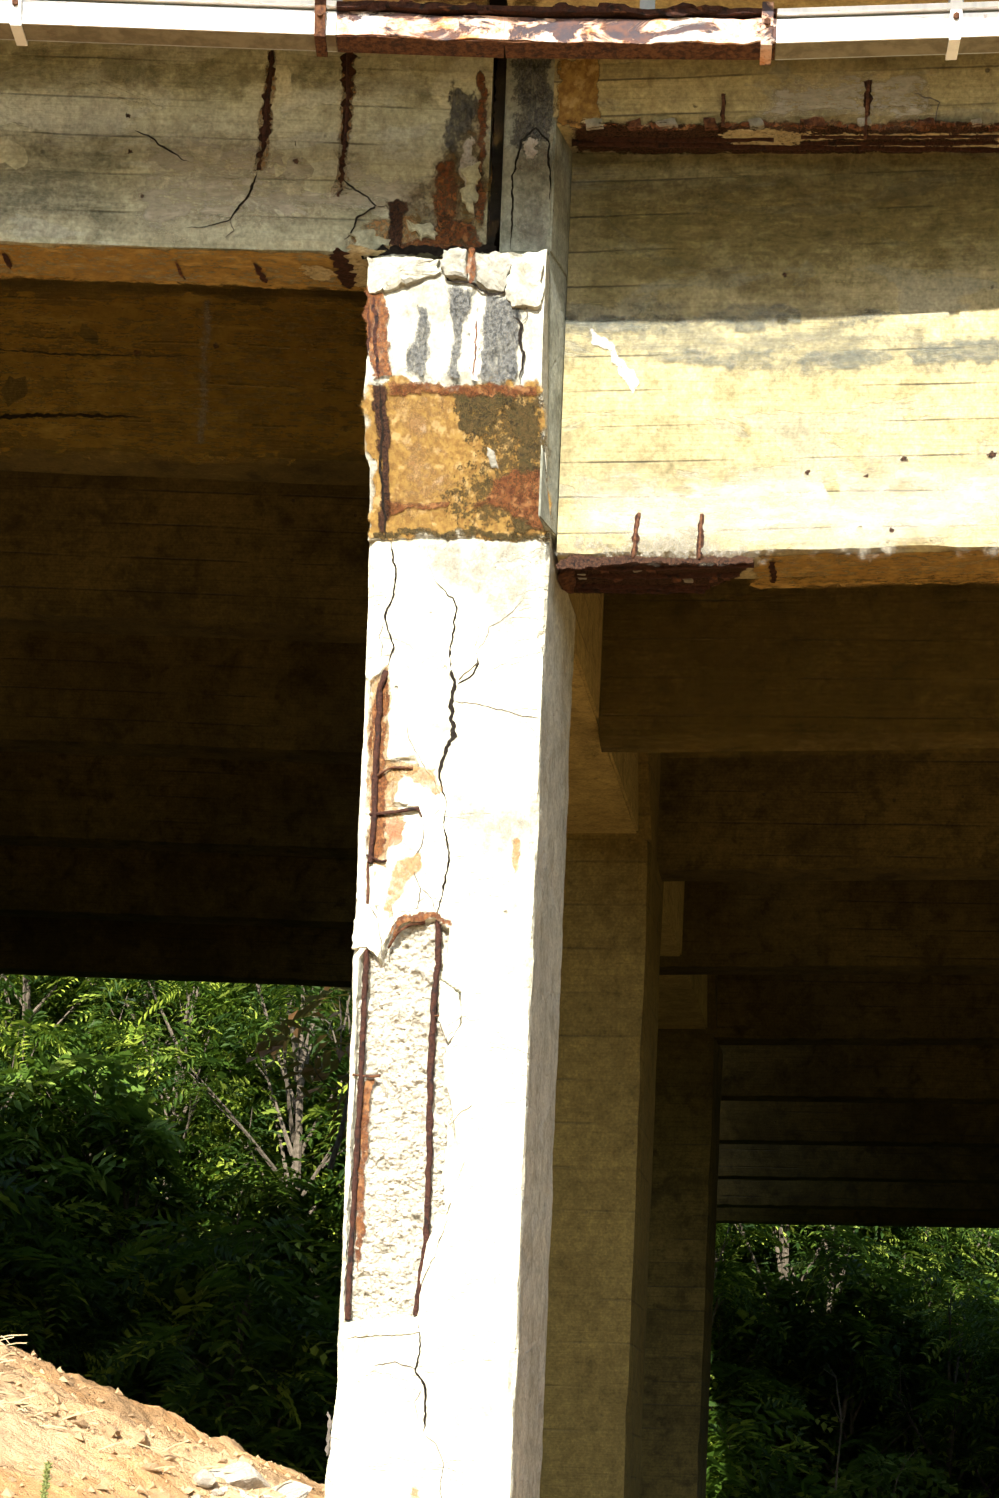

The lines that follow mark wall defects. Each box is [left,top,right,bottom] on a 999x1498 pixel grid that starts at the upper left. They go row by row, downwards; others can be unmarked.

spalling [334,52,358,197]
spalling [566,80,999,155]
crack [187,174,257,238]
spalling [253,263,268,283]
corrosion [0,71,552,543]
leakage [404,305,430,376]
spalling [299,127,551,310]
leakage [446,285,522,382]
crack [378,543,540,913]
spalling [342,667,472,1339]
crack [374,1324,444,1498]